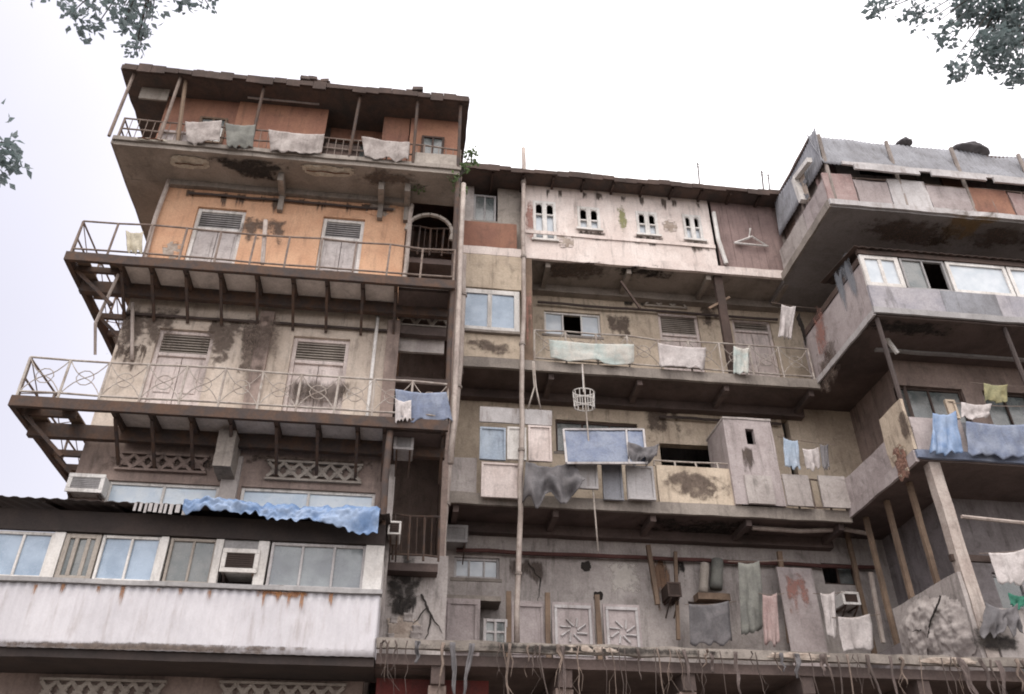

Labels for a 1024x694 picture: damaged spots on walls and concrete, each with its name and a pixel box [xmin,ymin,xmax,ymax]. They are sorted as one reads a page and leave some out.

damp [209,158,288,181]
damp [113,308,179,371]
damp [202,316,280,372]
damp [469,339,508,354]
damp [608,302,644,339]
damp [665,471,716,500]
rust [262,591,306,608]
damp [388,575,421,616]
crack [413,594,442,639]
crack [912,595,941,654]